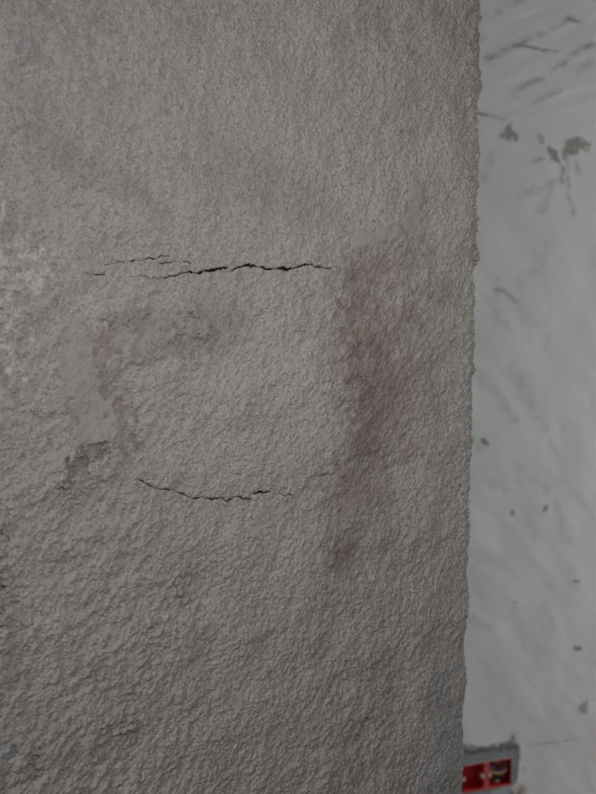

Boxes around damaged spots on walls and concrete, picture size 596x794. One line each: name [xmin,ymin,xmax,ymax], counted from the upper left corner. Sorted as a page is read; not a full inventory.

crack [87,255,332,280]
crack [138,479,293,502]